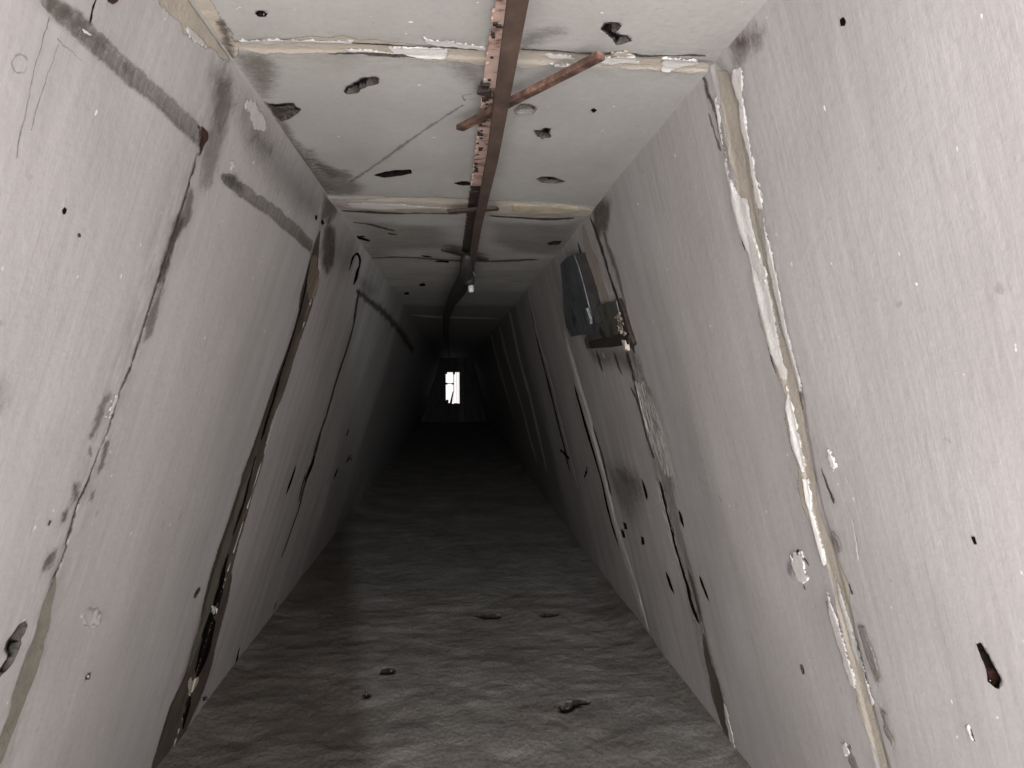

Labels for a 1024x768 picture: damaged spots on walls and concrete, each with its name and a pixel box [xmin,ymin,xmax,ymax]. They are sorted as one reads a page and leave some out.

peeling [543,53,575,68]
spalling [601,22,640,65]
peeling [661,56,698,73]
crack [0,153,198,764]
crack [215,265,310,604]
crack [281,222,536,558]
peeling [714,67,841,589]
spalling [0,622,28,677]
peeling [826,575,894,747]
peeling [840,742,858,768]